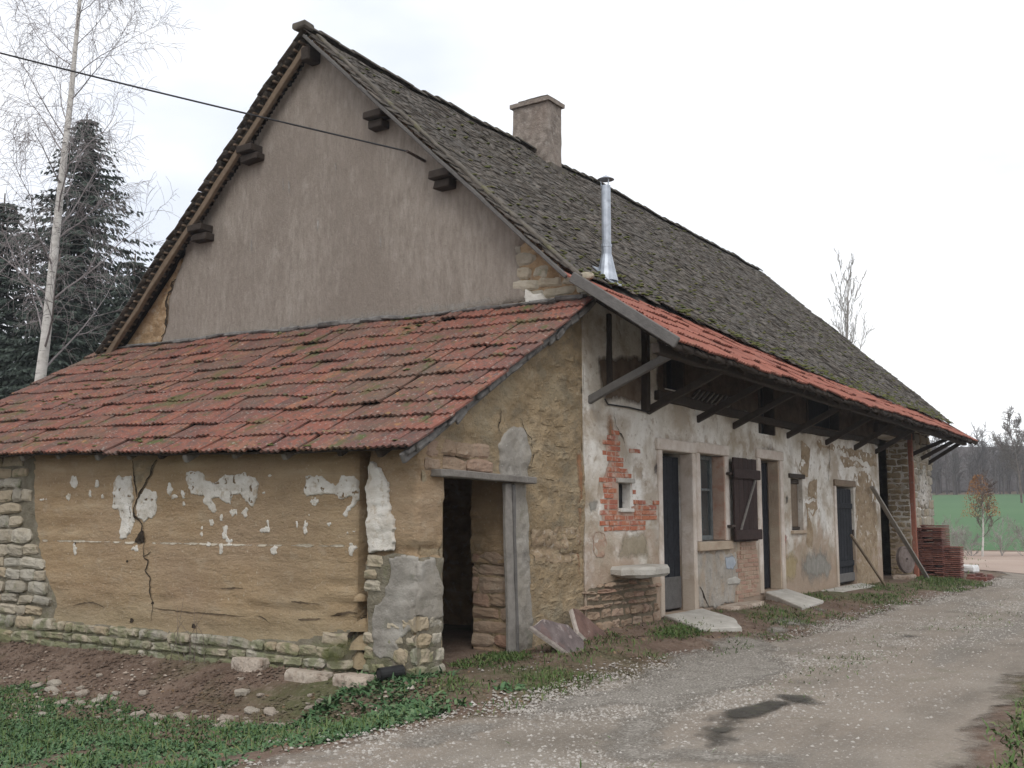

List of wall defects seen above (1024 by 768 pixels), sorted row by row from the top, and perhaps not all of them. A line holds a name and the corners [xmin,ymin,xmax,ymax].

crack [132,459,157,614]
peeling [89,471,272,555]
peeling [295,461,396,565]
spalling [530,430,659,564]
spalling [799,440,878,584]
spalling [349,618,368,670]